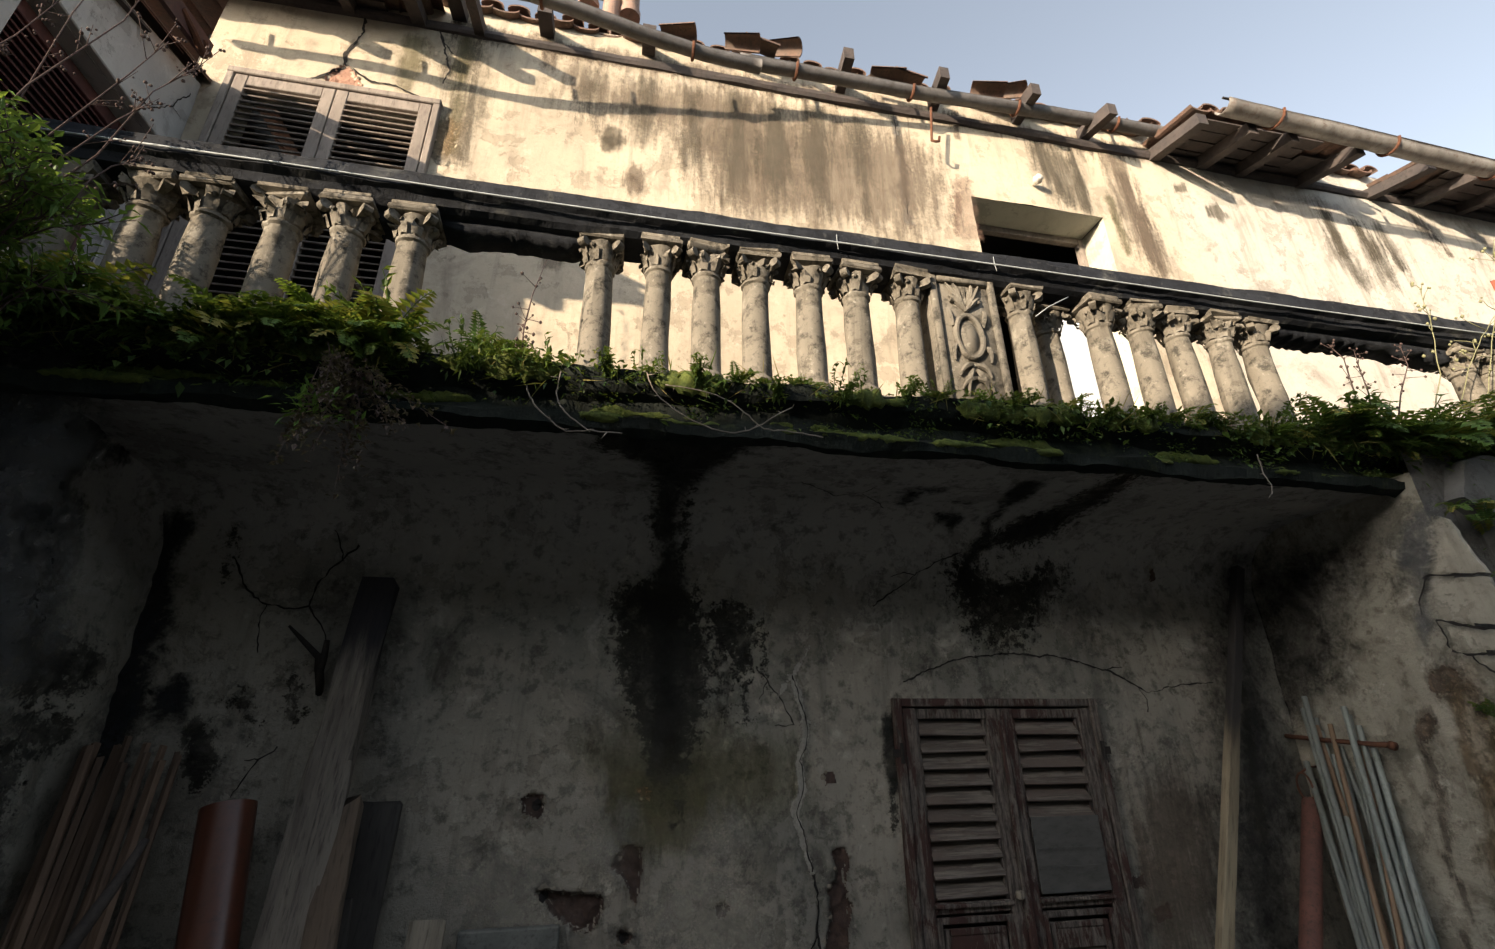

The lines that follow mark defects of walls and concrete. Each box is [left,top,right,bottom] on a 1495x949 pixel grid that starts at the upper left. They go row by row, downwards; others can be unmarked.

crack [311,18,454,96]
damp [441,20,967,236]
damp [982,119,1168,278]
damp [1317,201,1407,288]
crack [232,530,360,653]
damp [590,434,776,832]
crack [903,652,1213,712]
flaking render [518,789,547,820]
crack [756,645,821,949]
flaking render [534,883,605,939]
flaking render [609,841,643,906]
peeling [822,847,854,949]